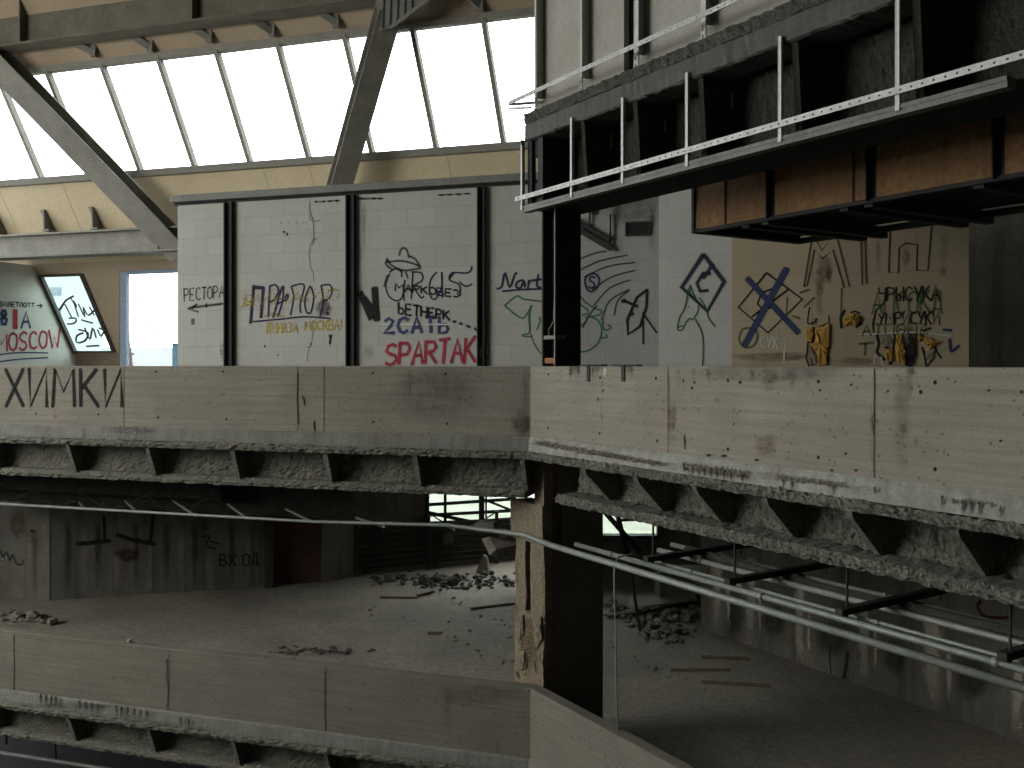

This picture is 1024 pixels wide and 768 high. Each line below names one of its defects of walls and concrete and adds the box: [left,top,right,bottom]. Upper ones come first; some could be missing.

crack [309,203,320,282]
peeling [534,441,667,466]
peeling [682,454,759,481]
peeling [775,469,847,492]
spalling [516,590,546,679]